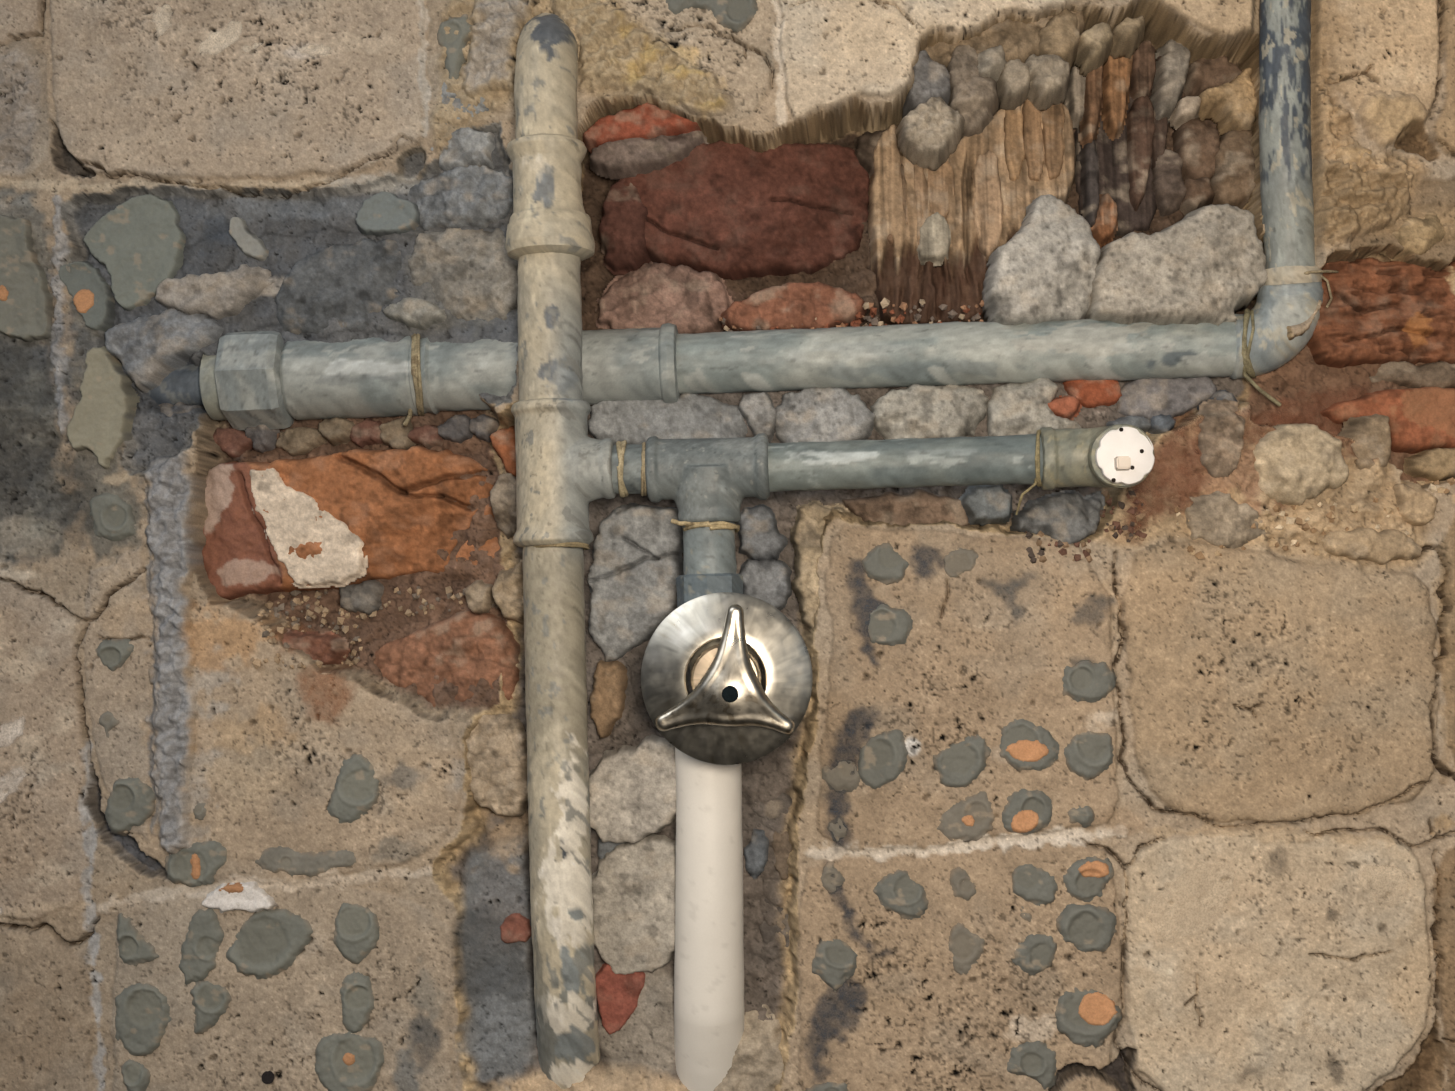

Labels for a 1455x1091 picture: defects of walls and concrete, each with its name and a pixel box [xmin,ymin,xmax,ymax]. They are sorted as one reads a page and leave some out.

crack [76,135,415,199]
spalling [578,84,913,331]
spalling [917,0,1265,252]
crack [1325,64,1378,84]
crack [1429,0,1455,157]
crack [0,570,143,763]
spalling [0,122,690,1091]
spalling [735,484,1123,1091]
crack [1082,545,1455,1090]
crack [0,917,100,946]
spalling [1049,1047,1137,1091]
spalling [1375,1020,1447,1091]